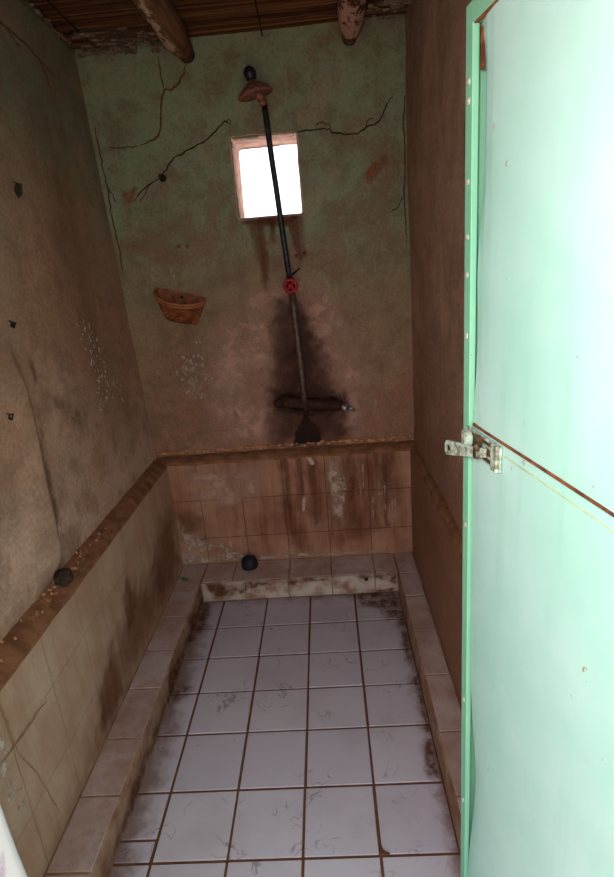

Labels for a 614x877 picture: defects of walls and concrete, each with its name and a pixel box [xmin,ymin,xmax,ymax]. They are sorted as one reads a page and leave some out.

crack [95,56,231,283]
crack [295,95,407,246]
damp [206,284,361,445]
damp [328,462,346,517]
crack [0,702,60,813]